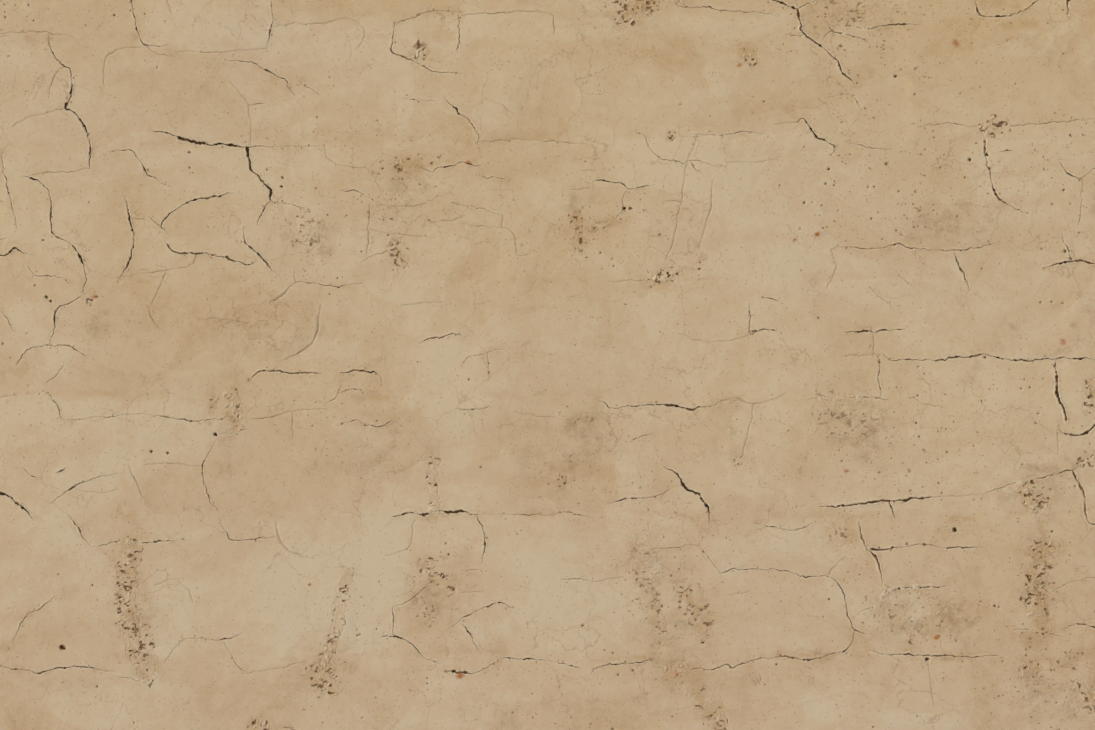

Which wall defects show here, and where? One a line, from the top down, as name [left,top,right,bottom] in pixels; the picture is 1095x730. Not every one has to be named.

crack [390,10,555,73]
crack [681,0,915,149]
crack [976,0,1038,17]
crack [103,0,528,324]
crack [0,31,407,555]
crack [615,468,710,513]
crack [604,394,784,454]
crack [812,290,1095,525]
crack [384,510,660,674]
crack [657,497,996,687]